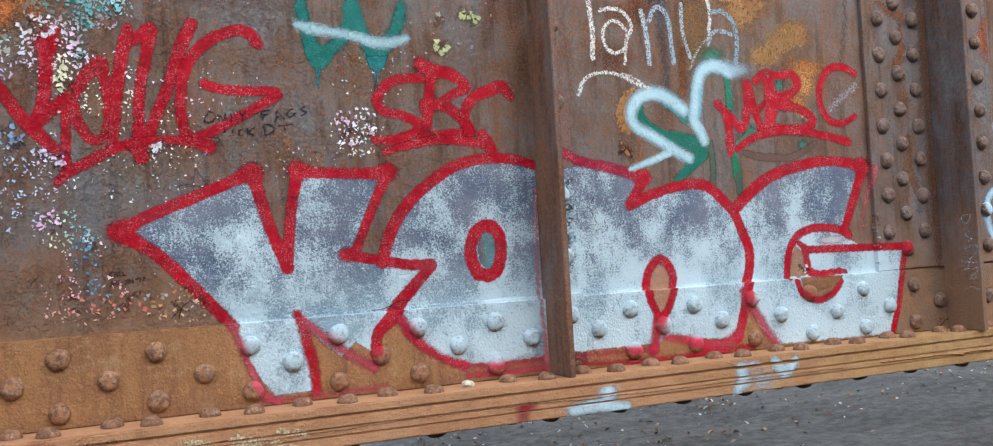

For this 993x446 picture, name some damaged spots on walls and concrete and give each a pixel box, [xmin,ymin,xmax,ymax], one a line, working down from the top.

corrosion [0,0,46,29]
corrosion [609,0,651,23]
corrosion [719,0,770,27]
corrosion [598,43,624,69]
corrosion [674,0,709,98]
corrosion [750,20,821,120]
corrosion [615,87,643,135]
corrosion [875,0,942,268]